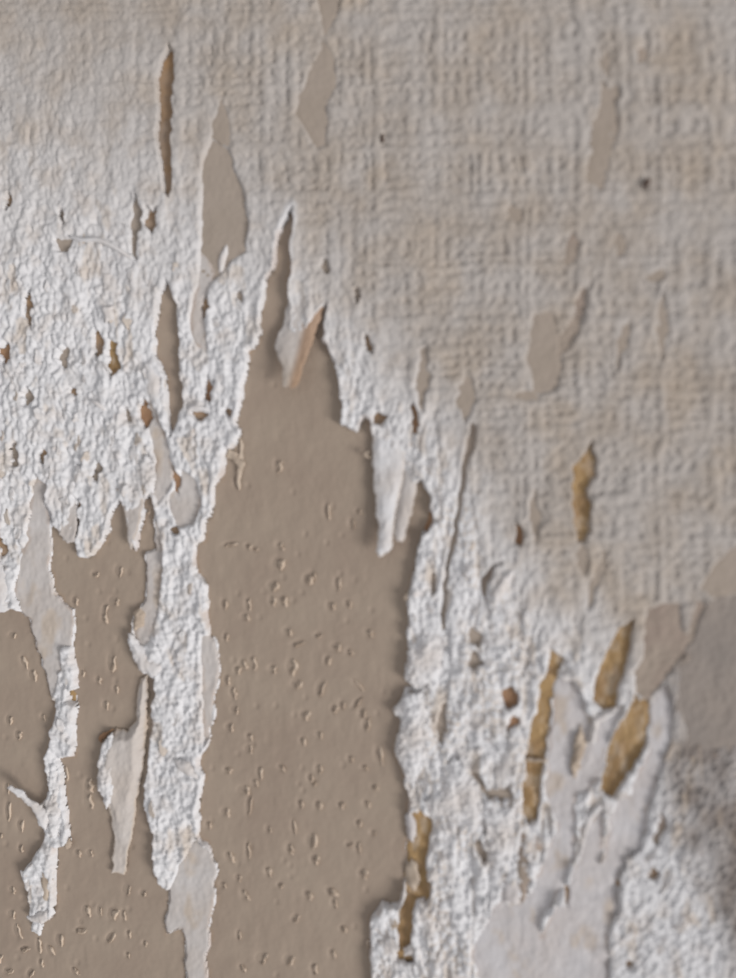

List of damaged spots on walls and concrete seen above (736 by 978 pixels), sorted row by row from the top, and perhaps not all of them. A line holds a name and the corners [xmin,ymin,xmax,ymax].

peeling [190,100,248,351]
peeling [295,0,340,149]
peeling [0,212,444,978]
peeling [424,603,689,978]